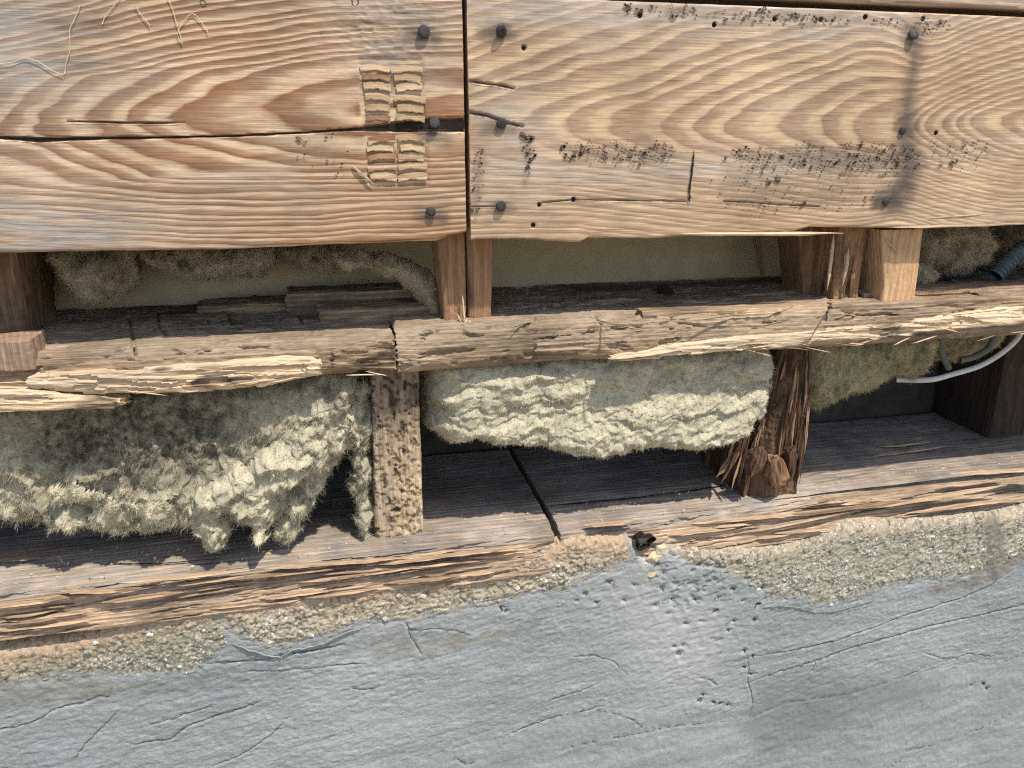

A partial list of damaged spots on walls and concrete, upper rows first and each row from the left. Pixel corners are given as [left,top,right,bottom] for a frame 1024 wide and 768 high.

water stain [623,3,849,26]
water stain [873,17,951,58]
mould [519,132,537,174]
mould [560,139,675,167]
water stain [711,108,920,216]
spalling [654,502,1024,621]
spalling [0,532,639,692]
crack [209,644,377,690]
crack [407,624,471,654]
crack [512,571,1024,751]
crack [2,692,116,756]
crack [139,702,257,744]